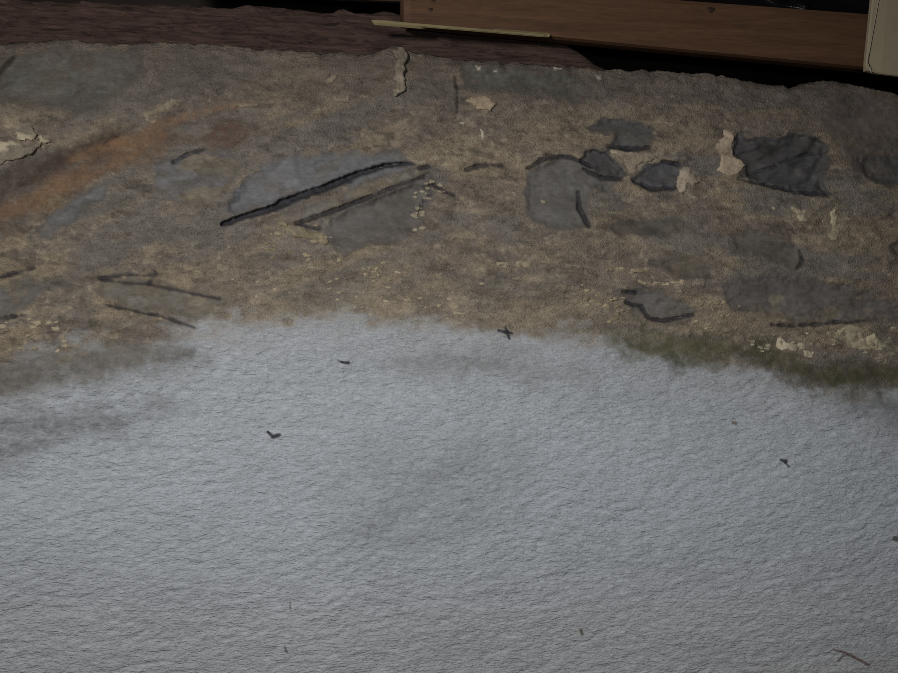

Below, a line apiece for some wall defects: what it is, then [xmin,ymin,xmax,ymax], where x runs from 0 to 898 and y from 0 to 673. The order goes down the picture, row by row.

spalling [524,118,680,229]
spalling [733,133,829,196]
spalling [156,149,454,262]
peeling [822,209,840,240]
spalling [580,284,731,330]
spalling [4,317,68,354]
spalling [750,332,815,358]
spalling [827,324,897,362]